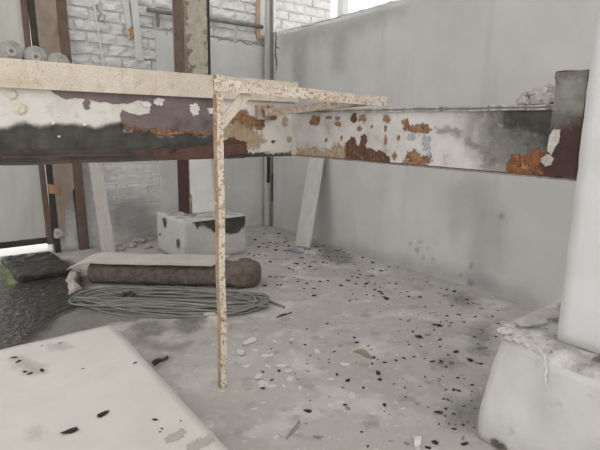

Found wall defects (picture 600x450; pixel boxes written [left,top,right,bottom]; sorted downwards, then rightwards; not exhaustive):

peeling [51,90,213,133]
corrosion [122,123,214,161]
corrosion [224,105,288,157]
corrosion [287,113,432,166]
corrosion [506,113,583,177]
peeling [540,129,561,167]
spalling [497,301,561,347]